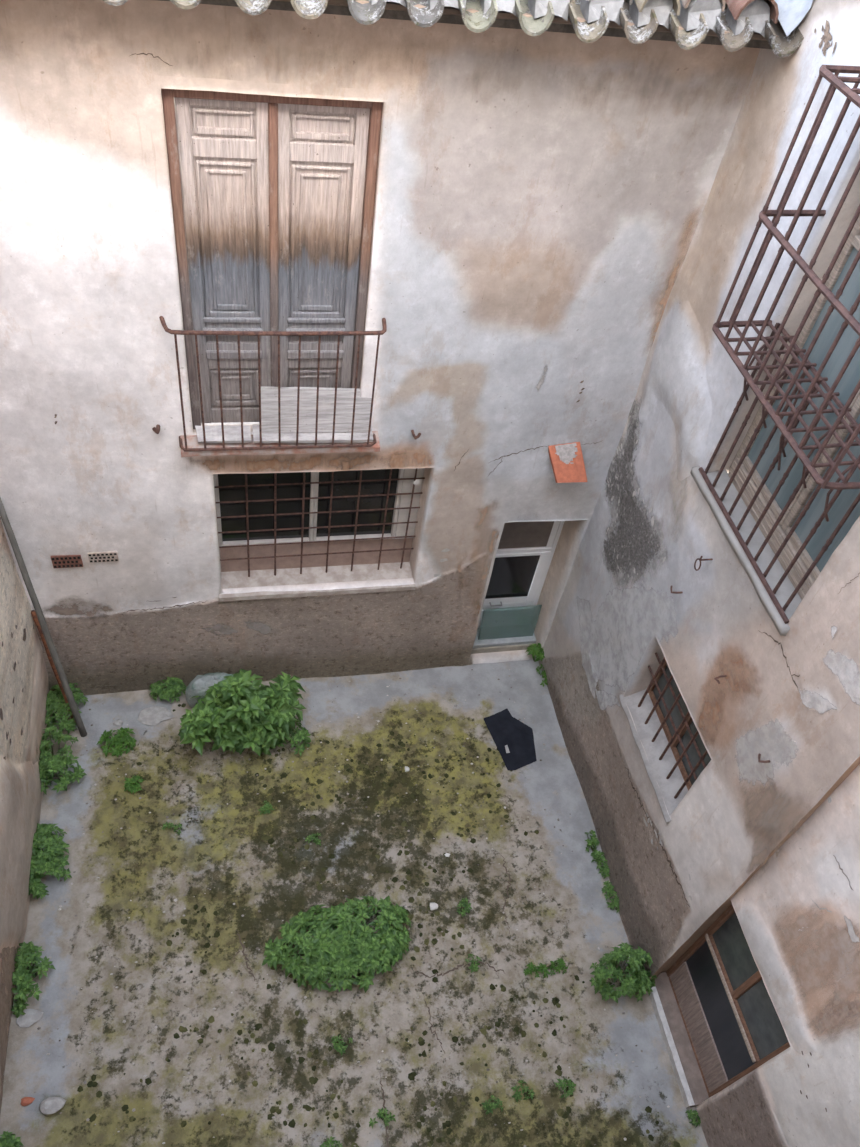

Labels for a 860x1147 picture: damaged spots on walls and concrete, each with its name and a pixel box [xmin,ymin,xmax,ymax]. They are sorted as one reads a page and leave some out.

water stain [606,401,667,585]